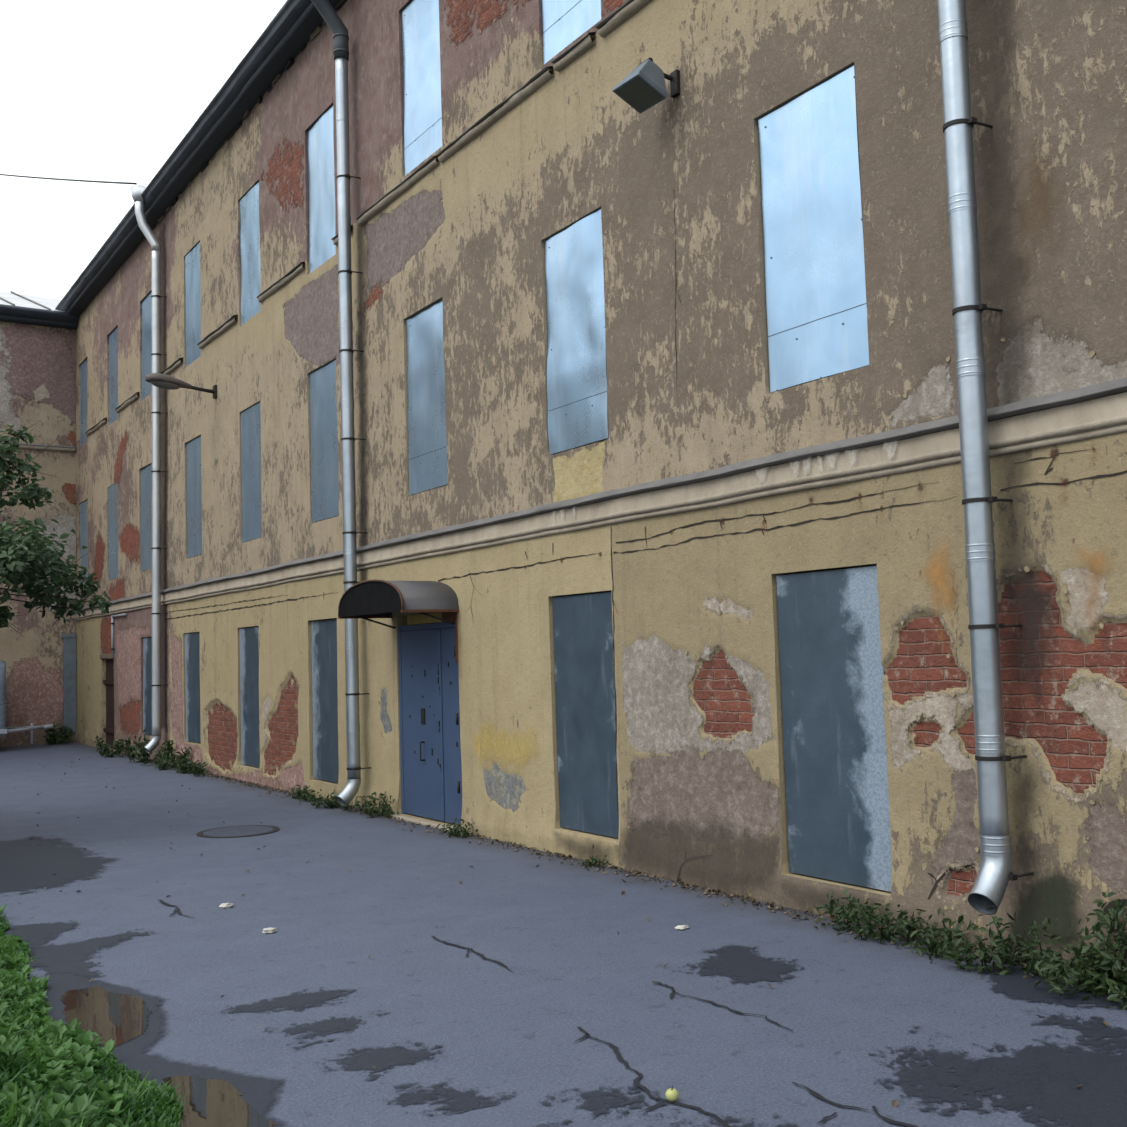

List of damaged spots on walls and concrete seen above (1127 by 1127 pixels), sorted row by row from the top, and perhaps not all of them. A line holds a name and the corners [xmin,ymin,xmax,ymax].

spalling [443,0,530,47]
spalling [260,135,304,212]
flaking render [0,321,76,436]
flaking render [884,356,955,427]
flaking render [995,318,1127,408]
flaking render [6,655,63,738]
spalling [170,635,305,792]
crack [438,482,956,811]
flaking render [622,636,780,842]
spalling [882,604,981,910]
spalling [996,562,1127,803]
leakage [624,823,775,888]